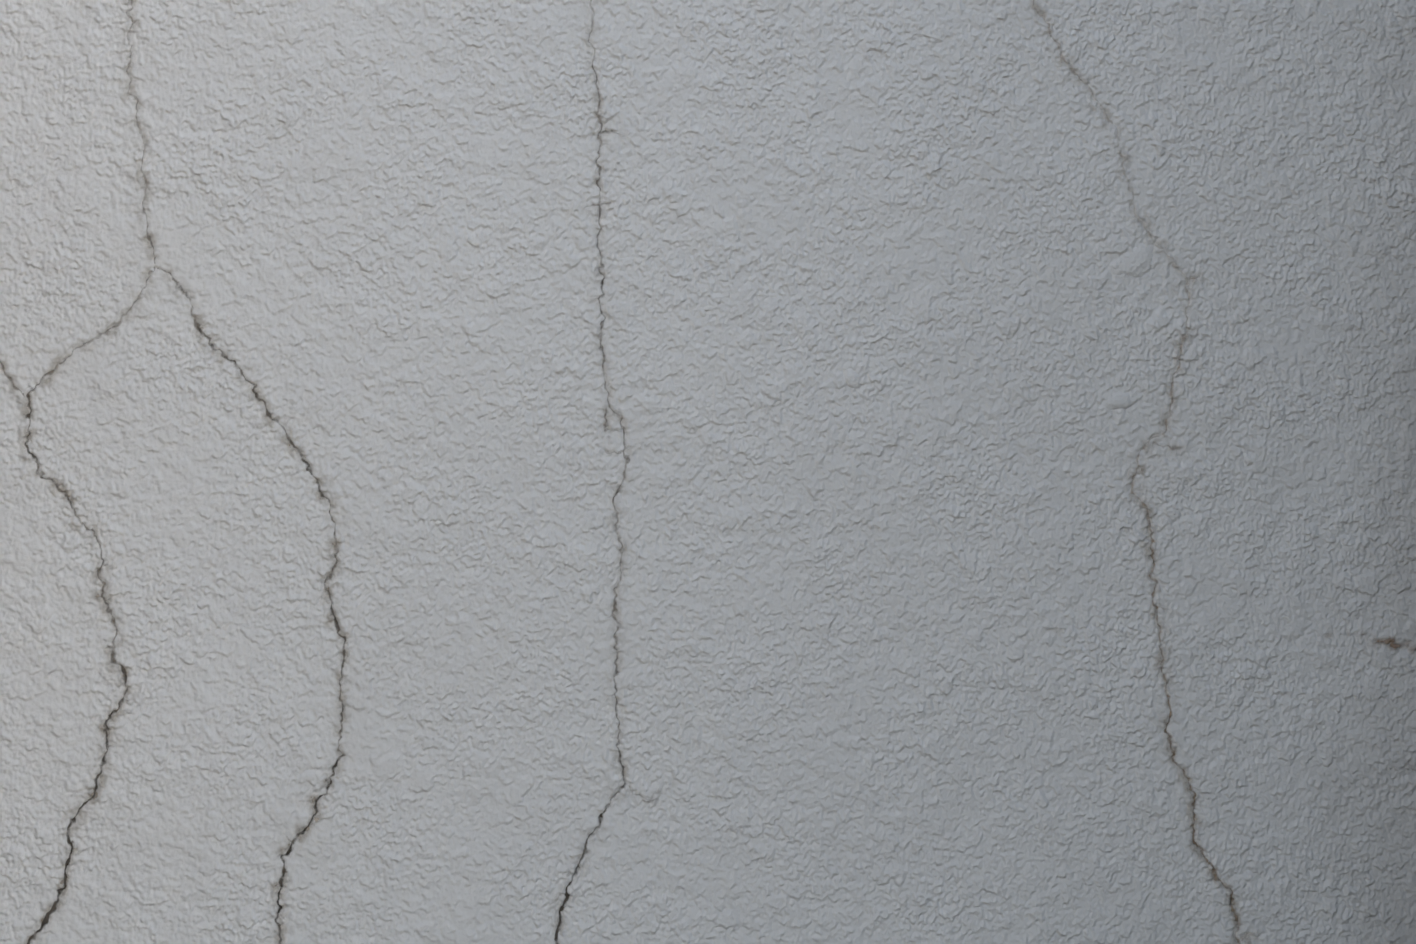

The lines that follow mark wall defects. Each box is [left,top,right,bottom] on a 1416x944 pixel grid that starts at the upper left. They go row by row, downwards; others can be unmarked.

crack [2,359,128,944]
crack [146,273,346,942]
crack [555,549,625,941]
crack [1149,540,1239,942]